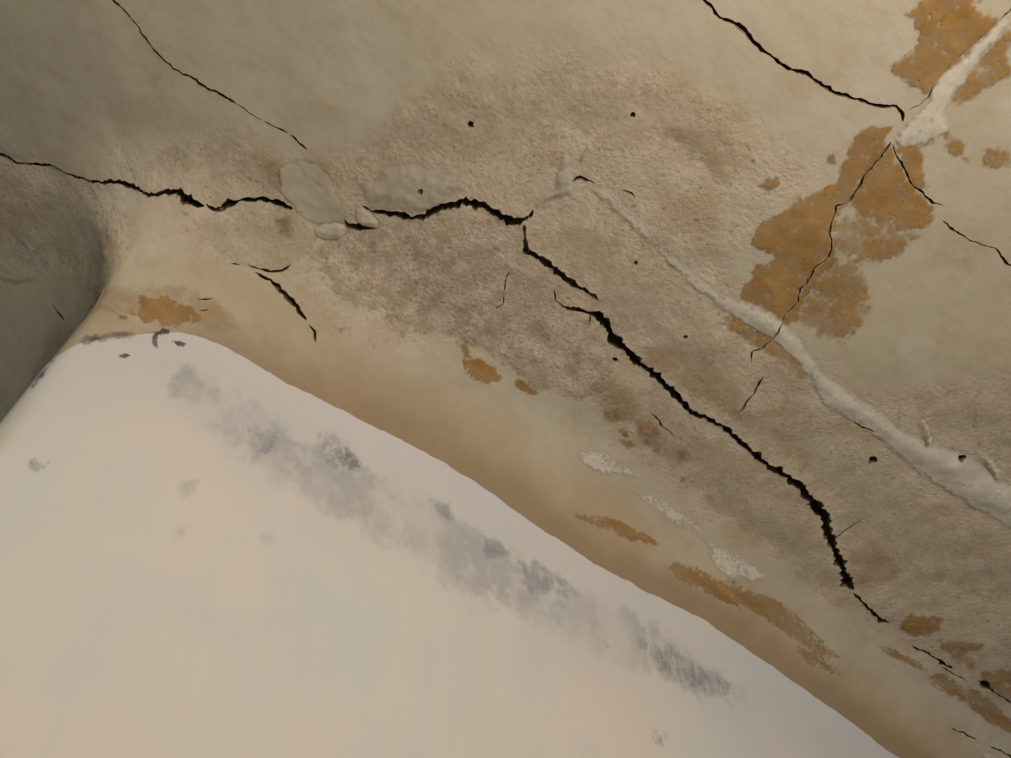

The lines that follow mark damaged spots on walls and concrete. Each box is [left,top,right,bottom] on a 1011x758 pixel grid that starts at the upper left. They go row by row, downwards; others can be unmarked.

crack [112,0,307,150]
peeling [892,0,1011,100]
crack [0,153,293,212]
peeling [120,295,201,327]
crack [232,263,316,342]
spalling [279,160,613,397]
crack [344,0,1011,623]
peeling [727,126,934,378]
peeling [576,513,656,544]
peeling [670,563,837,673]
peeling [901,616,1011,733]
crack [912,646,1011,703]